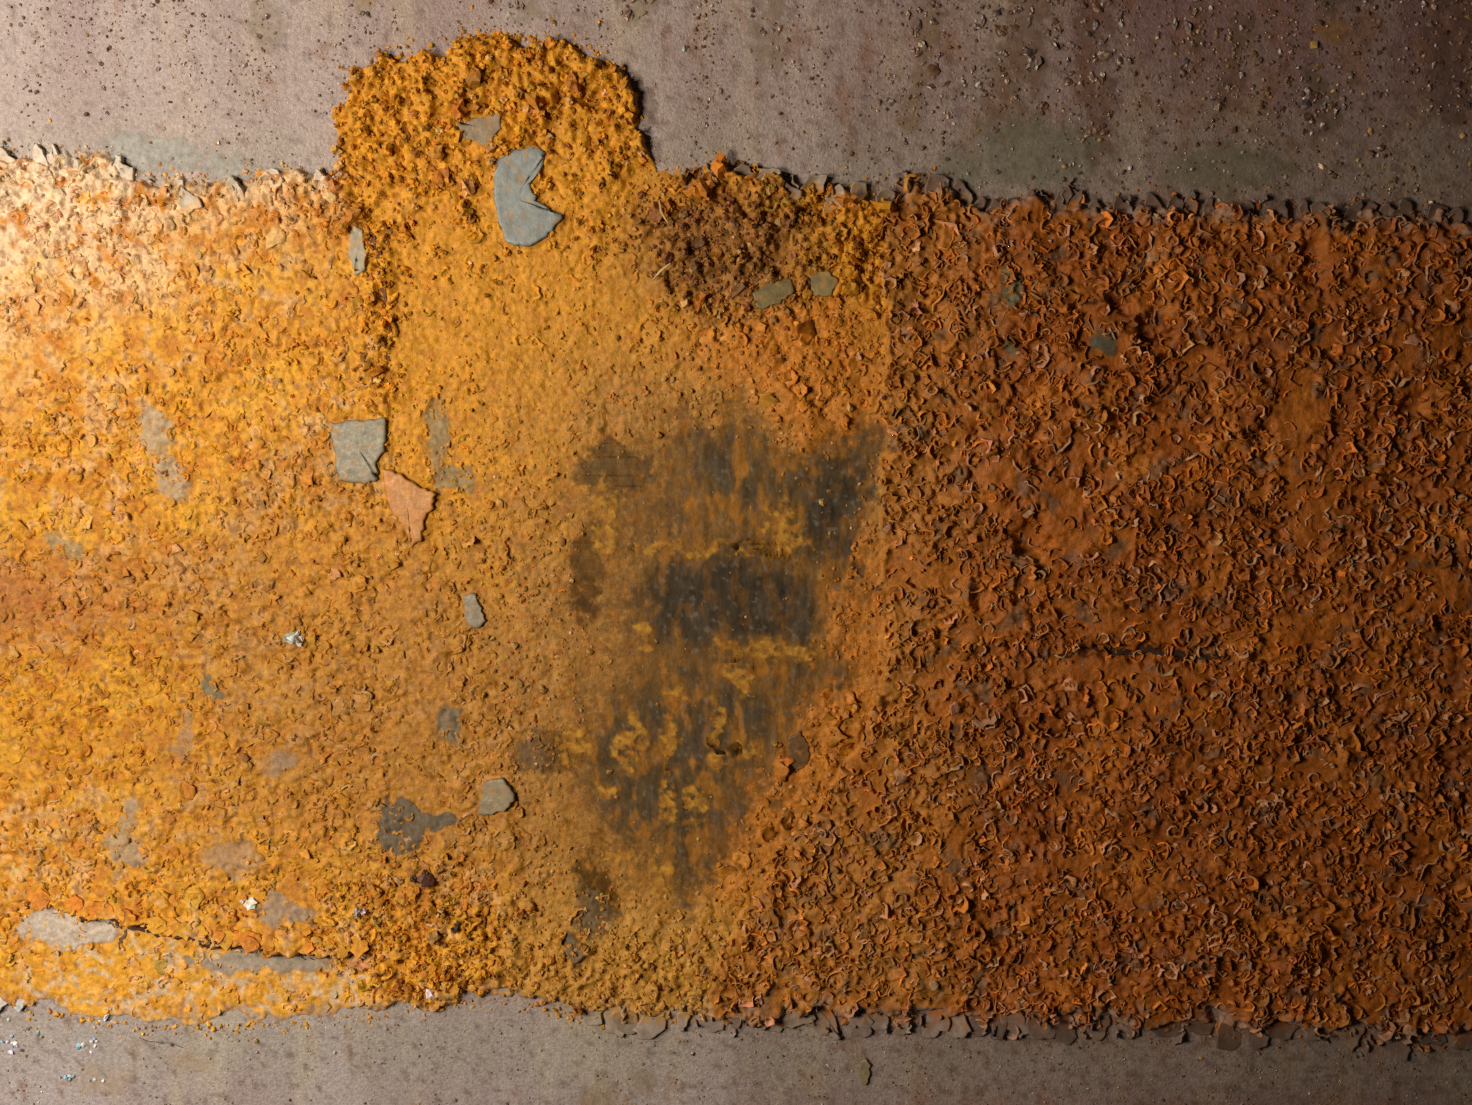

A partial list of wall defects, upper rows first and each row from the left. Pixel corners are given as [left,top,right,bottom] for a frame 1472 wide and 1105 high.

peeling [456,113,502,146]
rust [889,0,950,122]
rust [1163,0,1265,112]
rust [1278,63,1346,131]
peeling [493,145,563,247]
peeling [329,417,386,484]
peeling [377,389,887,967]